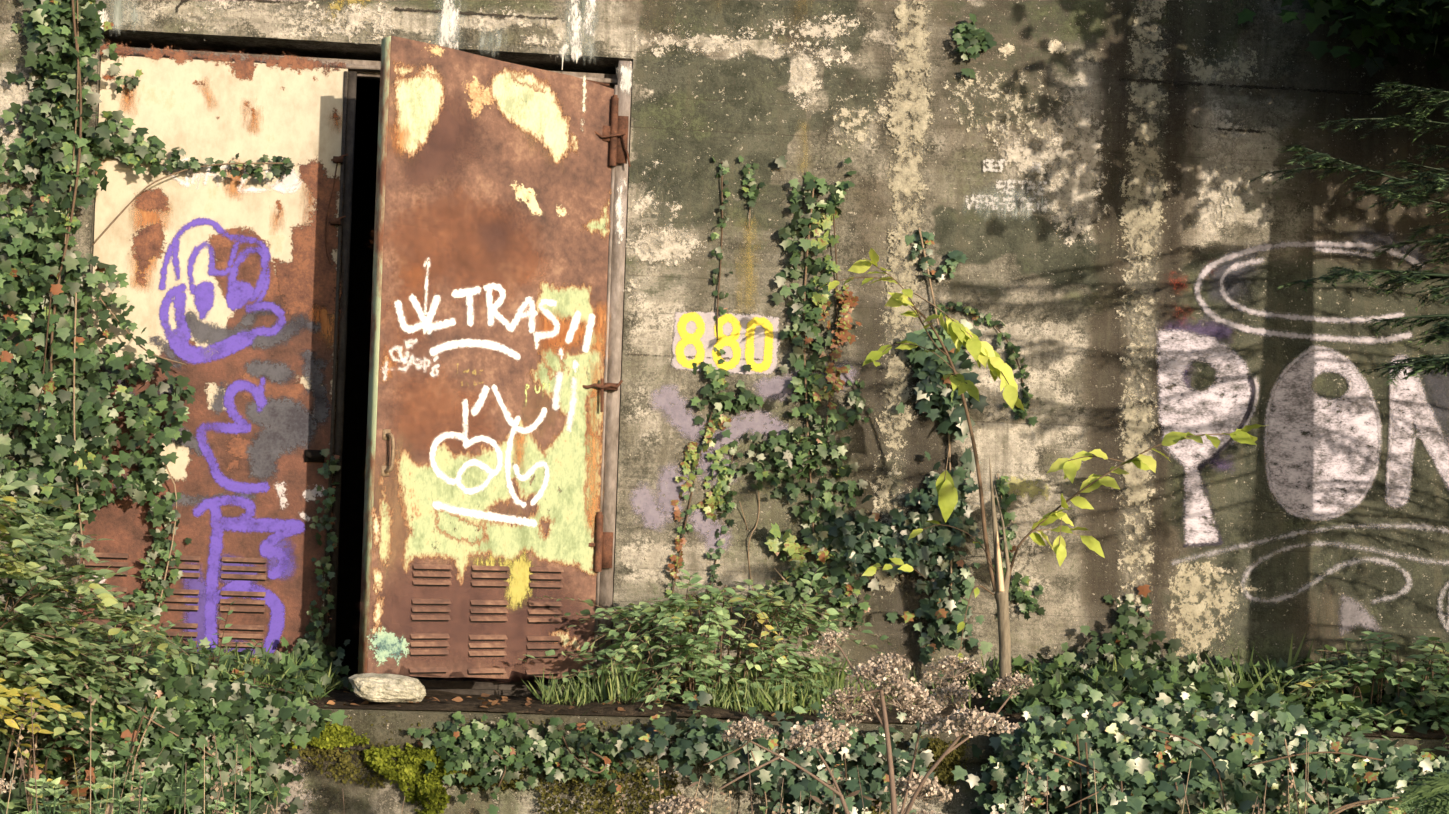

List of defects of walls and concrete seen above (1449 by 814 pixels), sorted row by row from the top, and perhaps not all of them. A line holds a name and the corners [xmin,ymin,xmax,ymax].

rust [103,74,133,110]
rust [100,43,346,81]
efflorescence [438,0,459,48]
efflorescence [559,0,598,59]
rust [393,99,473,187]
rust [78,155,344,659]
rust [516,395,553,466]
rust [538,307,607,526]
rust [372,449,582,670]